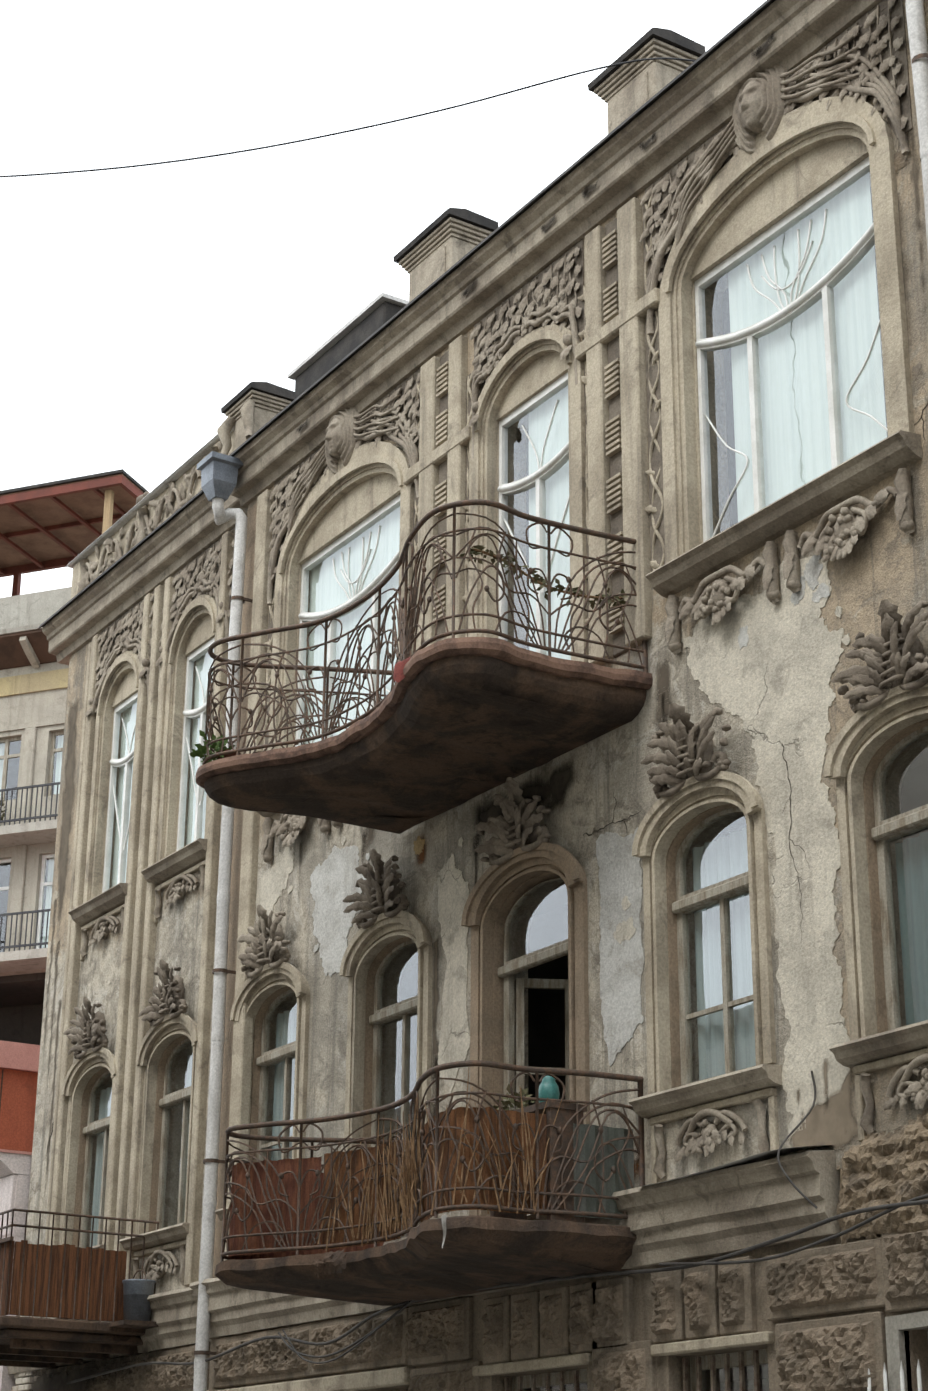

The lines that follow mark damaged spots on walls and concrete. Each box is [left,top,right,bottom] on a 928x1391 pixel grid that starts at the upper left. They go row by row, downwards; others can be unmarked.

peeling [256,846,295,928]
peeling [310,836,370,977]
peeling [681,552,851,1142]
crack [782,744,810,949]